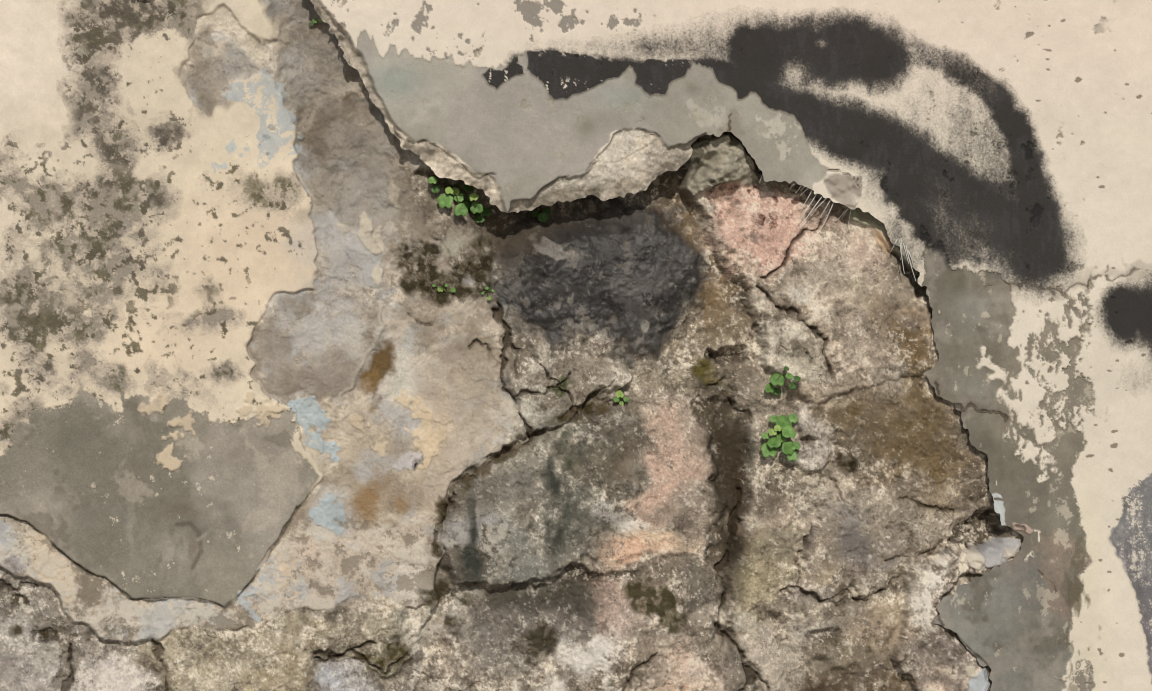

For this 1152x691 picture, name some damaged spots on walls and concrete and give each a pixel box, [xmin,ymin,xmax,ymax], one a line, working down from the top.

water stain [0,0,720,451]
crack [400,305,433,326]
peeling [179,0,933,319]
crack [756,219,832,375]
water stain [465,443,489,480]
crack [434,302,620,558]
spalling [0,178,1095,691]
crack [706,376,753,423]
crack [714,487,770,691]
crack [780,525,933,603]
crack [898,496,955,513]
crack [623,652,658,691]